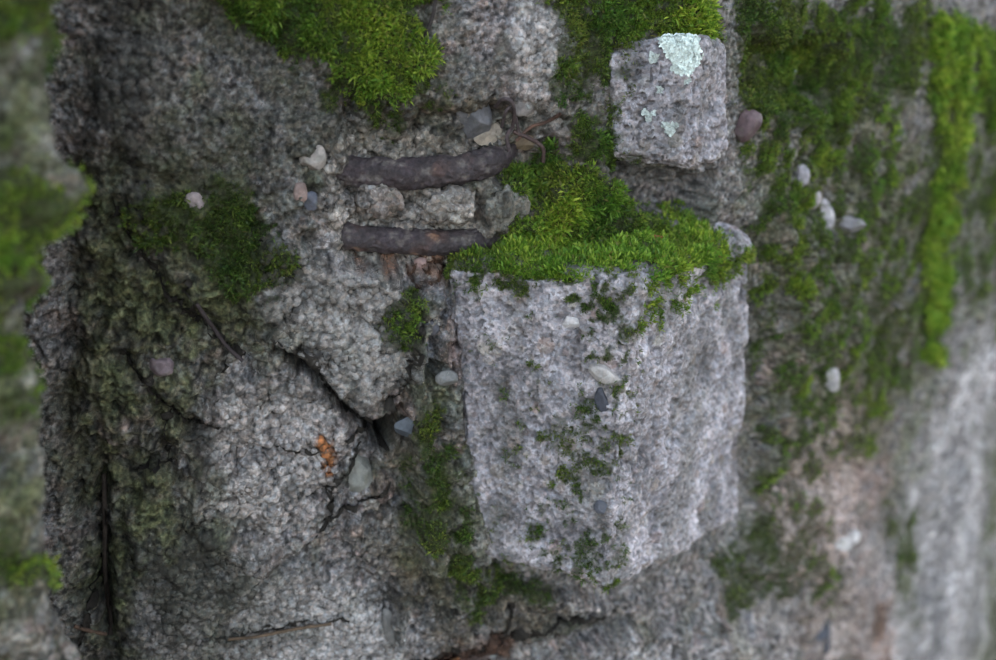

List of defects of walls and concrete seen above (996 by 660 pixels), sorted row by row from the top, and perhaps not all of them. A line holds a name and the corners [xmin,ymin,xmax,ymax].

spalling [320,113,519,282]
crack [78,490,111,646]
corrosion [432,633,514,660]
spalling [450,640,546,660]